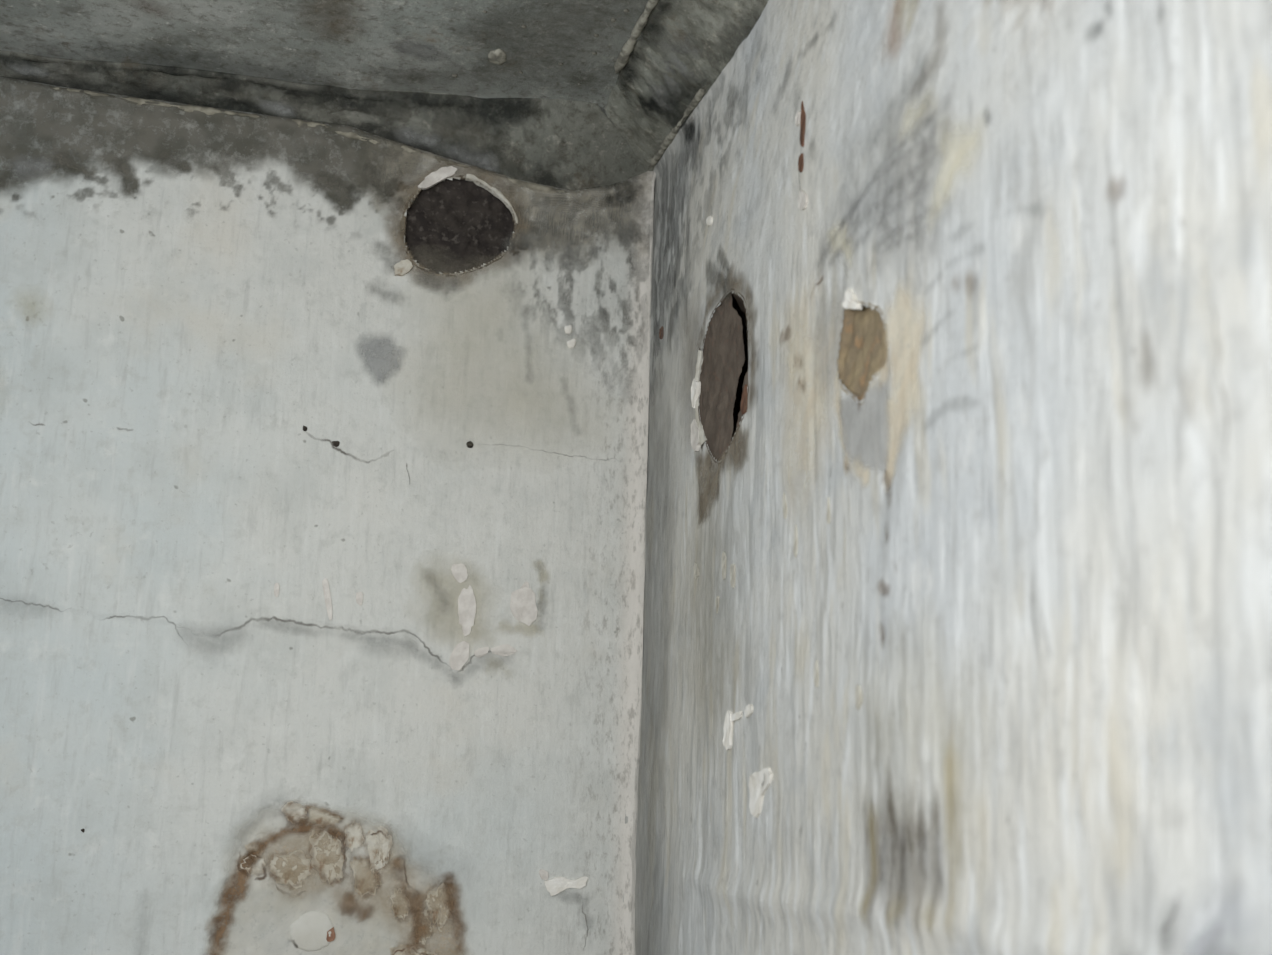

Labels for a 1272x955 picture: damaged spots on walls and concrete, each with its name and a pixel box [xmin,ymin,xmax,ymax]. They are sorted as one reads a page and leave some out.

leakage [488,48,506,65]
leakage [0,54,641,300]
peeling [842,288,862,310]
leakage [564,325,576,349]
peeling [449,563,517,671]
peeling [510,582,538,626]
peeling [723,704,754,750]
peeling [749,768,773,818]
spalling [211,801,462,955]